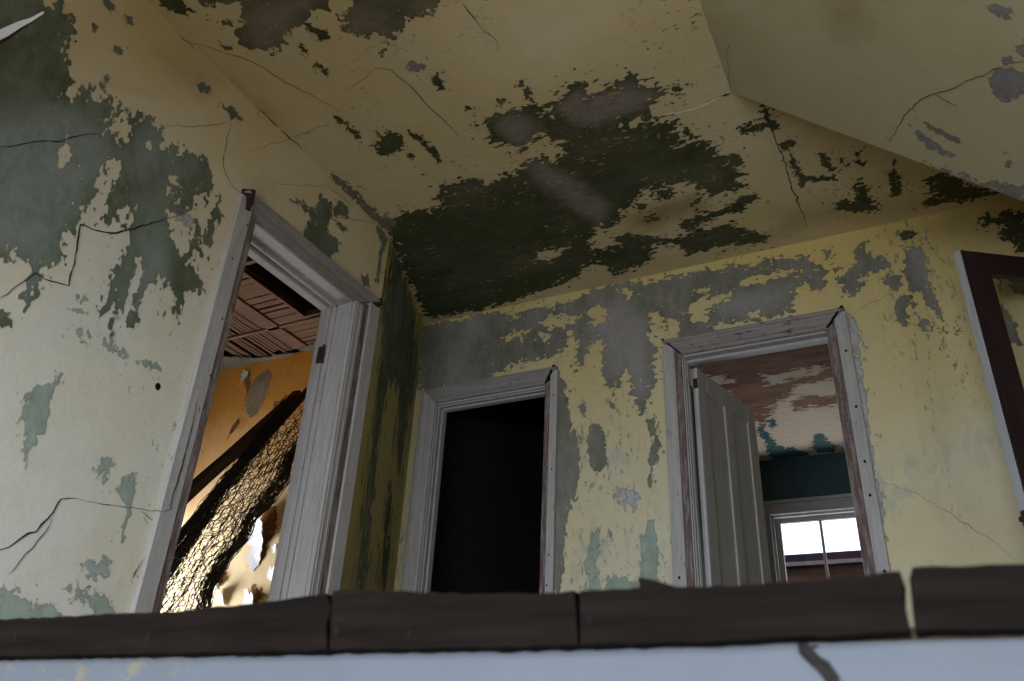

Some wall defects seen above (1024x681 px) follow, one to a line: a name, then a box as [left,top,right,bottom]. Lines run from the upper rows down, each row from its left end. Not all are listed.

crack [0,133,100,147]
peeling [0,0,225,371]
crack [160,36,333,183]
crack [351,68,457,135]
crack [765,109,806,222]
crack [887,60,1024,140]
peeling [988,44,1024,103]
crack [0,214,180,298]
peeling [289,61,1024,593]
crack [0,402,197,572]